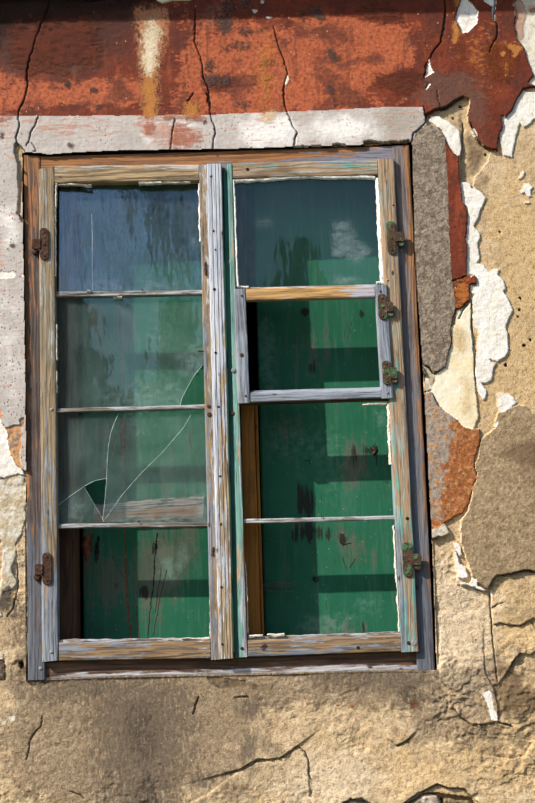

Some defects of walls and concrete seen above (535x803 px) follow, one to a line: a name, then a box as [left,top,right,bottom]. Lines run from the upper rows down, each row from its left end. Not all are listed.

crack [16,5,49,152]
damp [133,2,169,118]
rust [163,100,206,148]
crack [189,38,215,139]
rust [451,21,464,58]
peeling [455,0,479,33]
rust [485,41,523,81]
peeling [500,0,535,158]
peeling [422,98,522,541]
peeling [0,409,27,596]
crack [462,570,535,677]
damp [17,671,213,803]